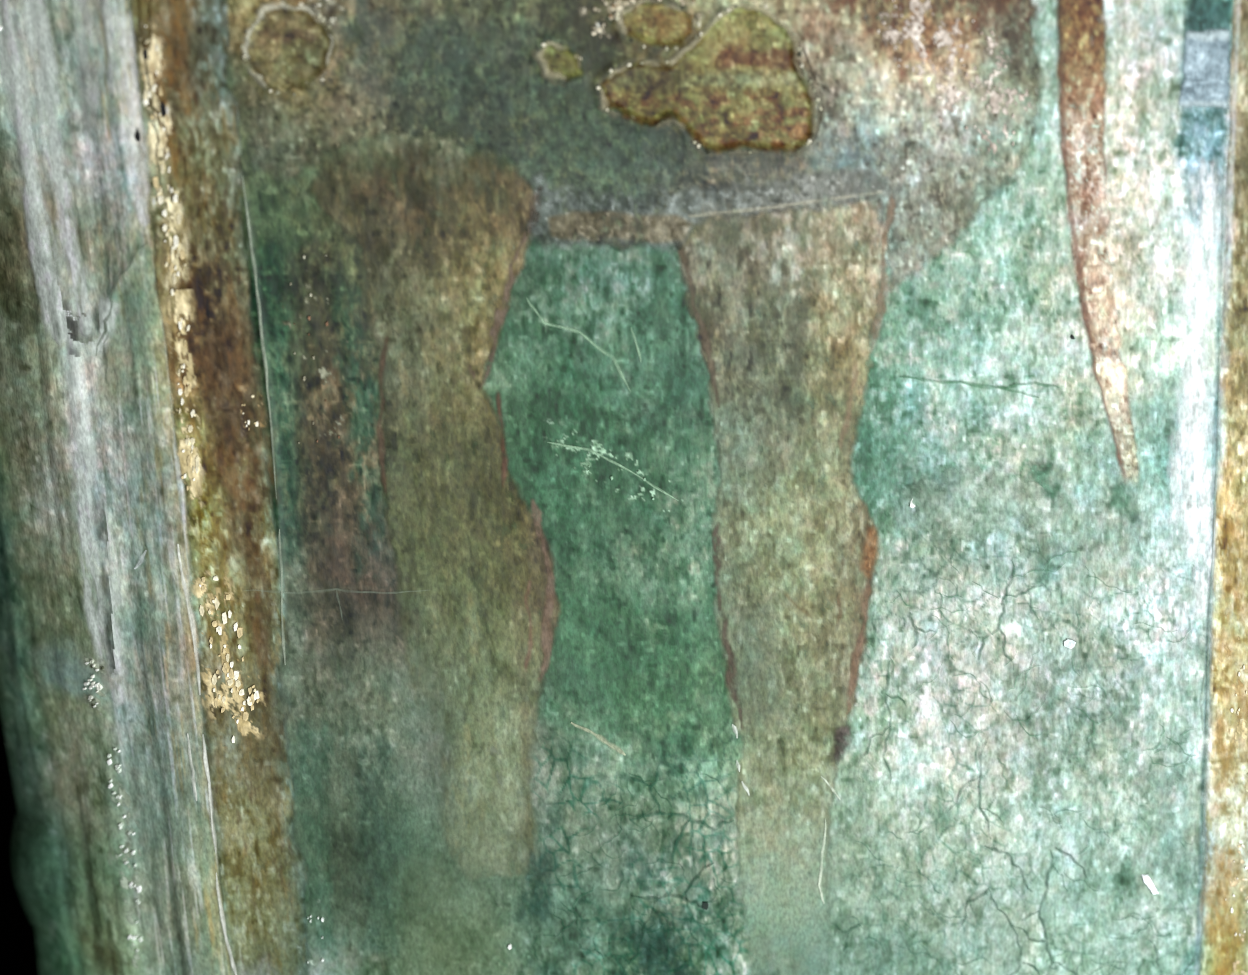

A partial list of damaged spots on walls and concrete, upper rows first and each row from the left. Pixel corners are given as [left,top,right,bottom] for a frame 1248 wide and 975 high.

peeling [141,22,203,504]
peeling [238,384,264,430]
peeling [193,572,263,743]
crack [959,775,1077,975]